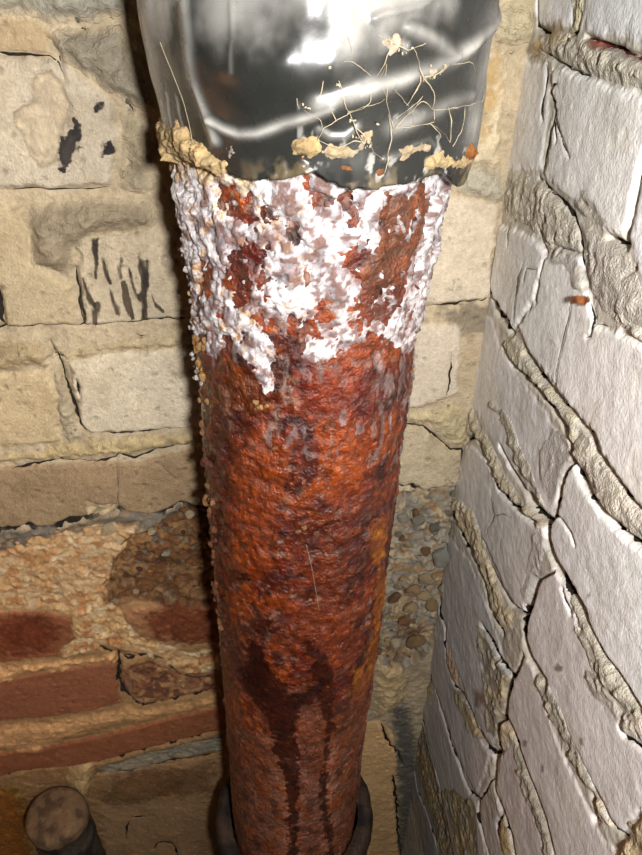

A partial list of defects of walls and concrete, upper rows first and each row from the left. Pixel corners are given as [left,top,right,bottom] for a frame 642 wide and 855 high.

crack [0,267,185,430]
corrosion [192,334,214,468]
water stain [169,161,452,395]
corrosion [202,483,217,566]
corrosion [351,517,398,700]
water stain [238,639,337,855]